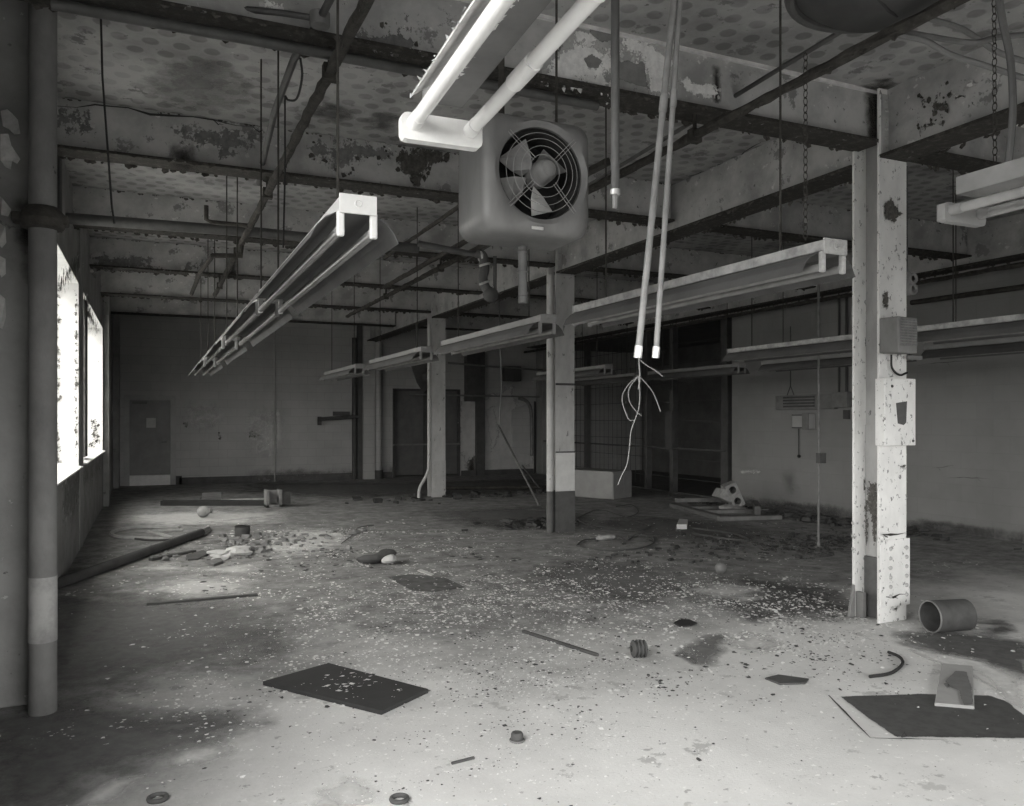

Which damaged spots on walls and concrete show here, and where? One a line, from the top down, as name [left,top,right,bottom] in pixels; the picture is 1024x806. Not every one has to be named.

peeling [541,29,722,105]
peeling [0,109,20,169]
peeling [57,107,95,135]
crack [60,104,260,133]
peeling [171,124,264,160]
spalling [306,137,450,187]
spalling [917,80,976,130]
peeling [882,198,903,223]
peeling [0,197,11,277]